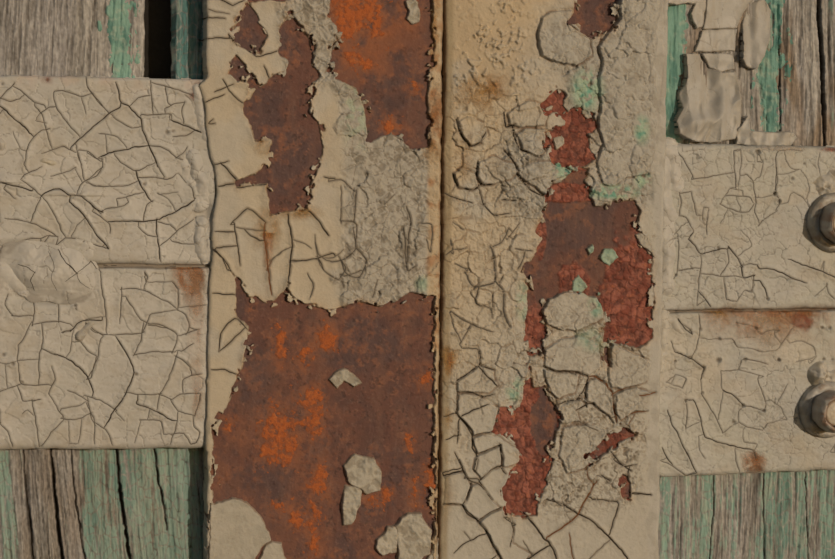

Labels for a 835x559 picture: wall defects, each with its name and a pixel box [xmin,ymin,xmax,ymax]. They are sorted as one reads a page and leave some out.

crack [0,78,248,559]
crack [200,0,277,77]
crack [215,161,267,188]
crack [213,177,378,298]
peeling [205,277,439,559]
peeling [228,0,435,214]
crack [385,113,651,559]
peeling [491,90,656,518]
peeling [566,0,617,40]
crack [543,83,835,559]
peeling [668,0,797,146]